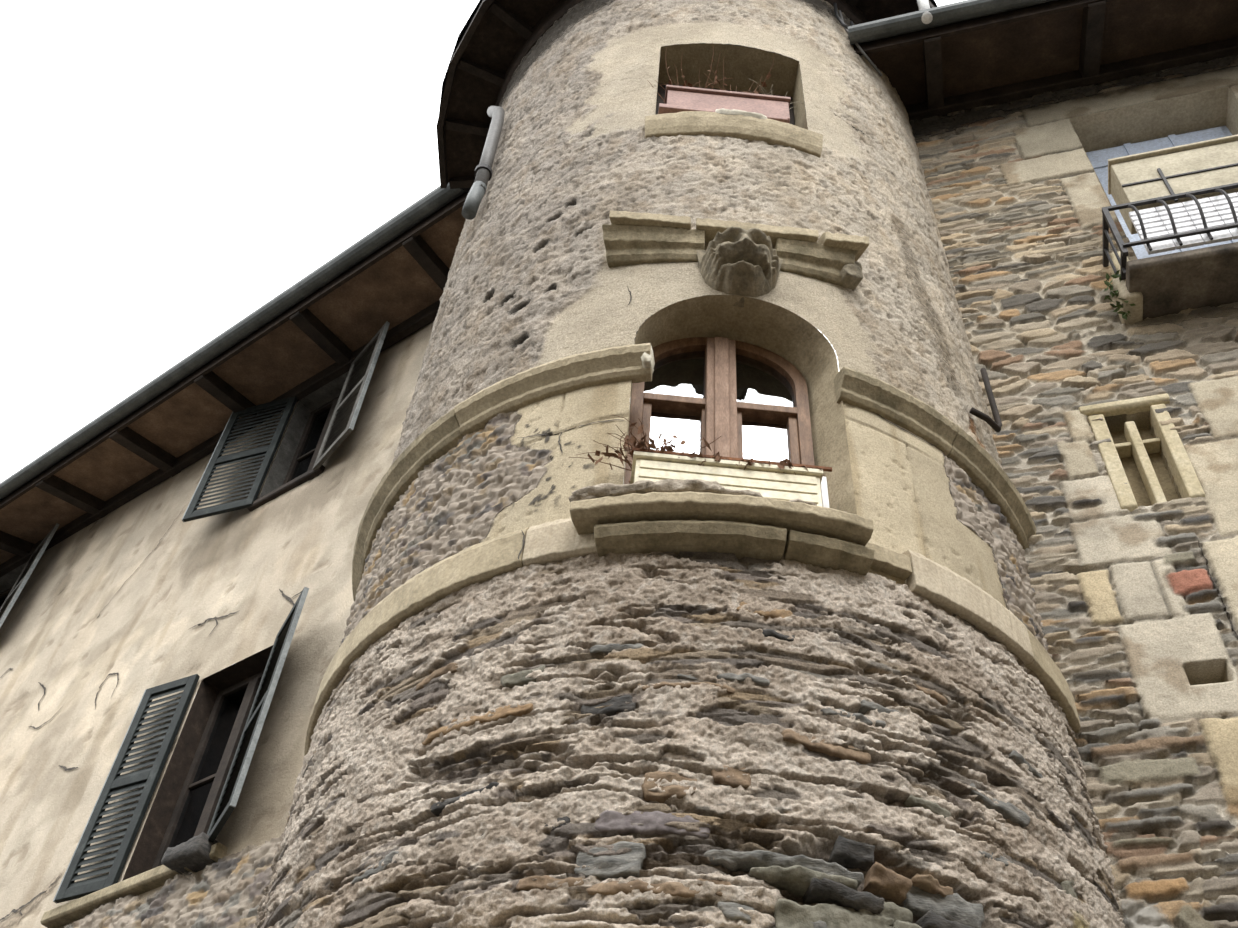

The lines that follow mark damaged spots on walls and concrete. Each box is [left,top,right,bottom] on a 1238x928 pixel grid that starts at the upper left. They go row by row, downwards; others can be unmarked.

crack [192,610,240,635]
crack [0,668,62,729]
crack [95,673,119,708]